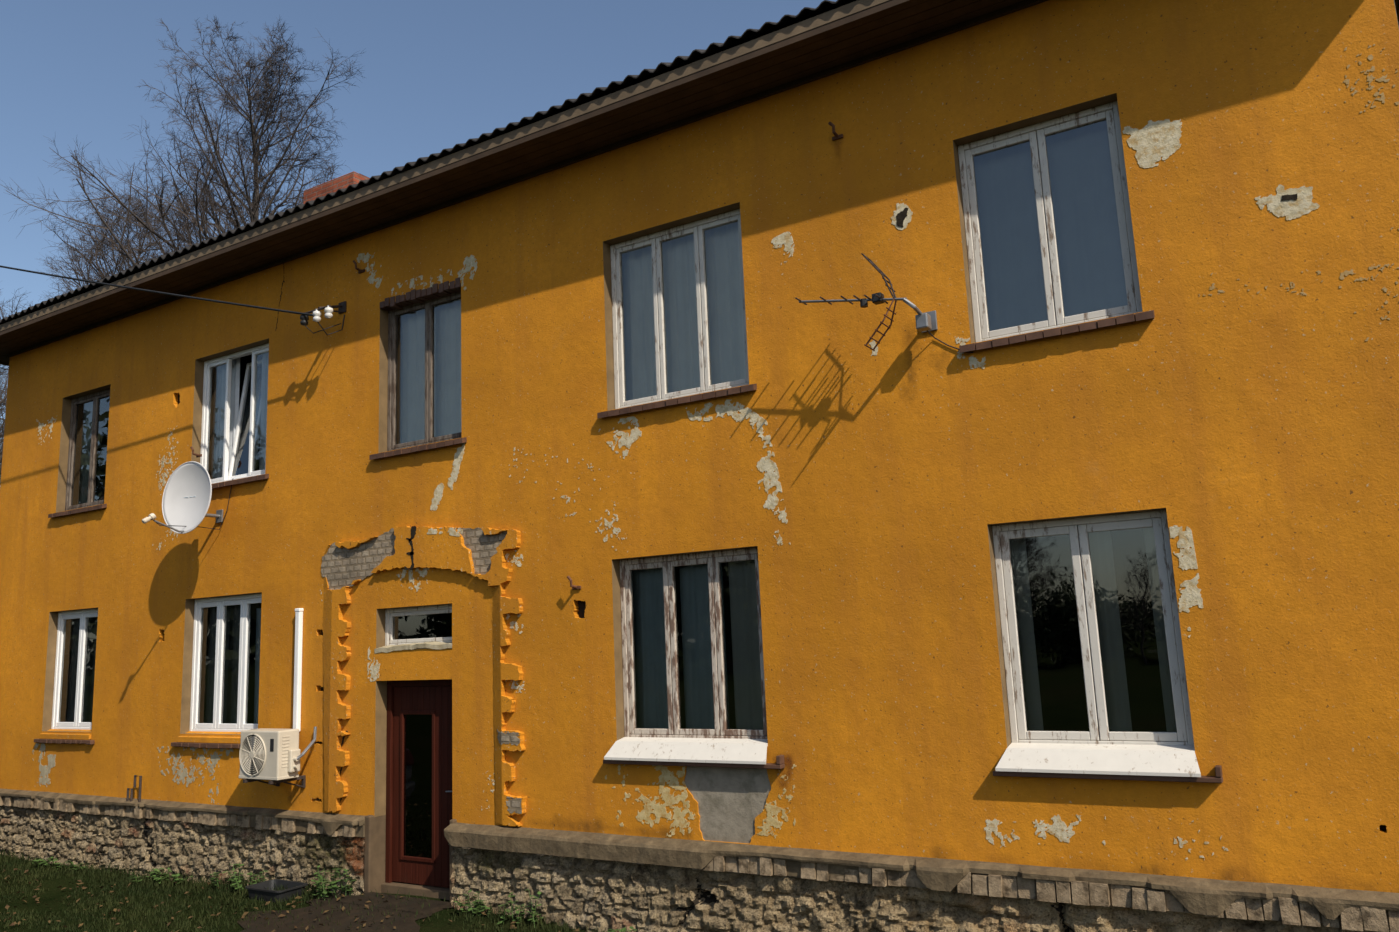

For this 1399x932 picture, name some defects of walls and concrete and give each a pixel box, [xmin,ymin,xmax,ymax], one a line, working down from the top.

peeling [1123,119,1182,169]
peeling [1254,184,1320,221]
peeling [686,399,791,545]
spalling [320,528,429,601]
crack [404,526,416,570]
spalling [427,527,524,575]
peeling [1169,525,1203,638]
spalling [605,764,796,844]
crack [140,818,157,867]
peeling [984,814,1081,848]
crack [676,878,713,929]
crack [1051,902,1067,926]